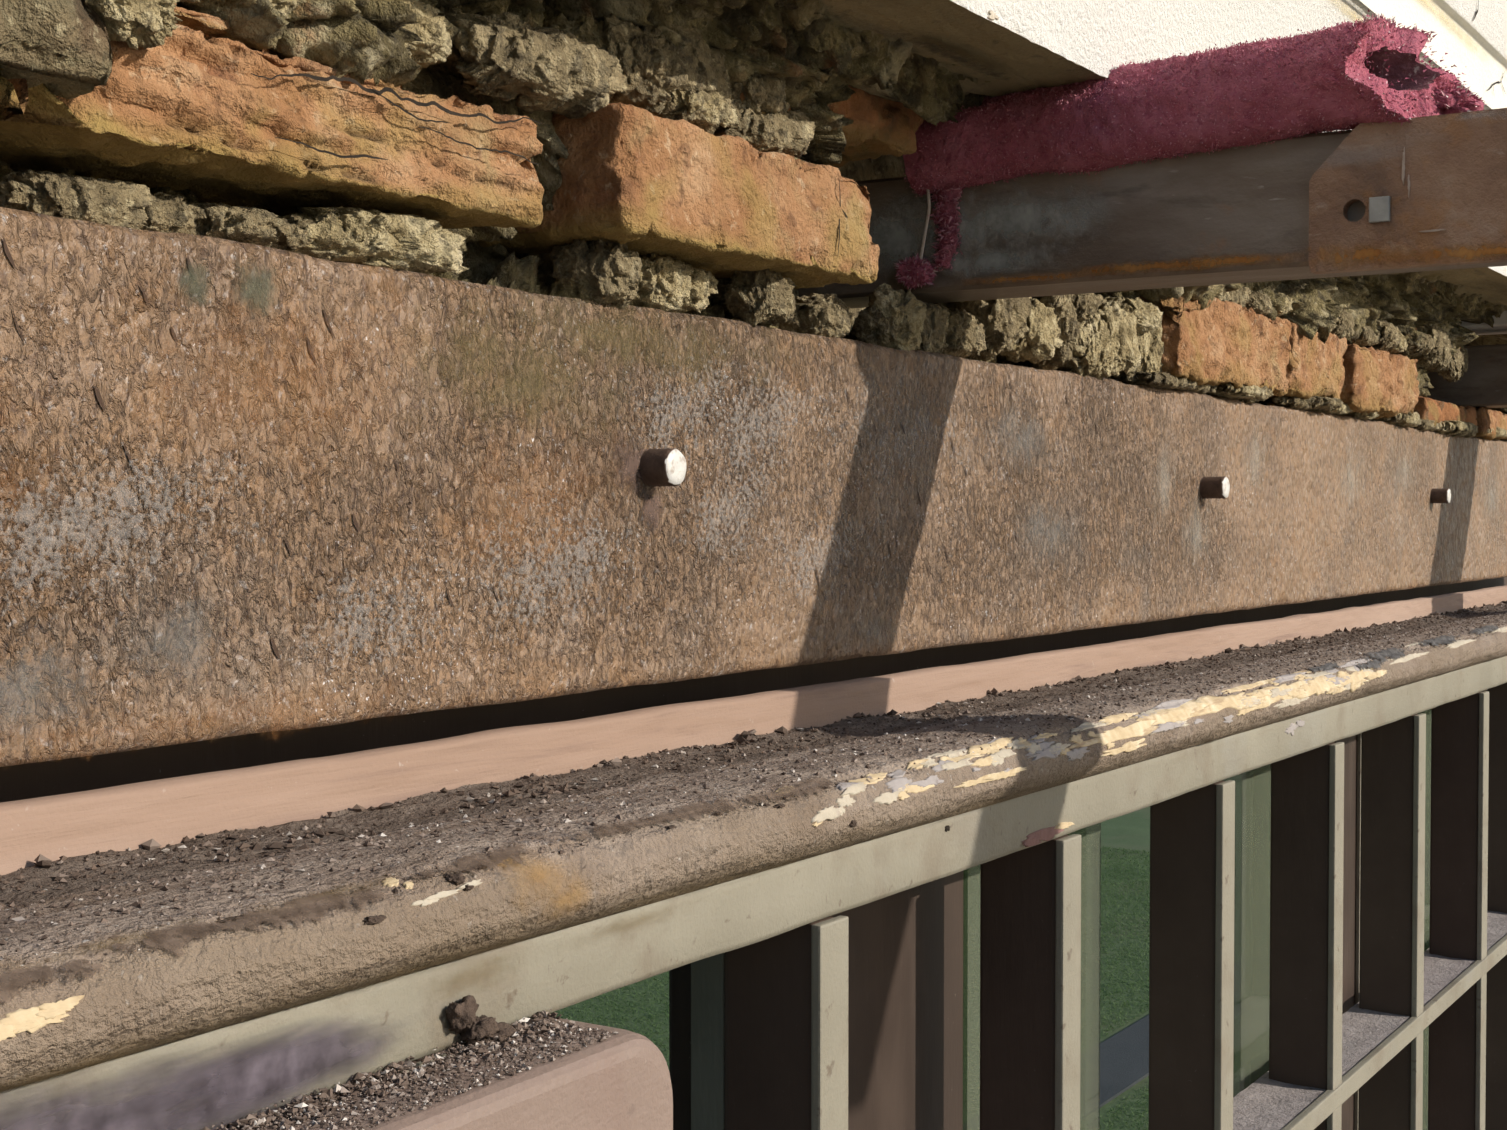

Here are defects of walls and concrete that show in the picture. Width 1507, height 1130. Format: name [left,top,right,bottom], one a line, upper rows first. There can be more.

crack [251,73,544,165]
rust [970,255,1282,284]
peeling [556,625,1507,841]
peeling [1022,822,1074,847]
peeling [112,843,530,956]
peeling [0,959,104,1042]
peeling [0,1030,379,1130]